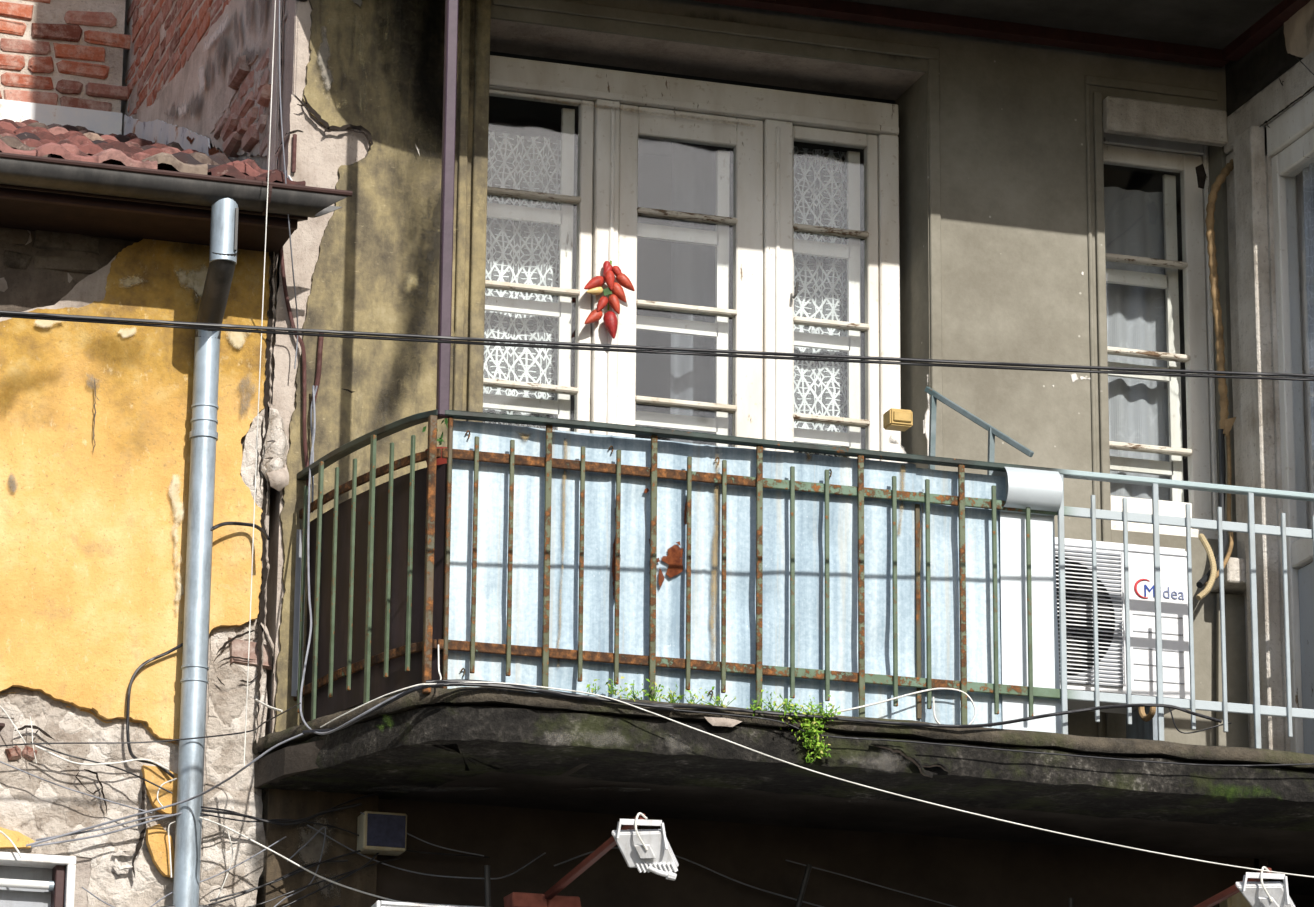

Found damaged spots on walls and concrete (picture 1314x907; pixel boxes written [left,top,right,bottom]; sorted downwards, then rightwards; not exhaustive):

damp [166,0,266,117]
spalling [210,47,271,158]
damp [381,0,446,161]
peeling [118,328,136,337]
peeling [176,267,208,296]
peeling [228,331,246,348]
spalling [272,95,370,454]
damp [380,191,441,426]
corrosion [649,541,684,588]
corrosion [710,464,720,660]
spalling [0,687,179,907]